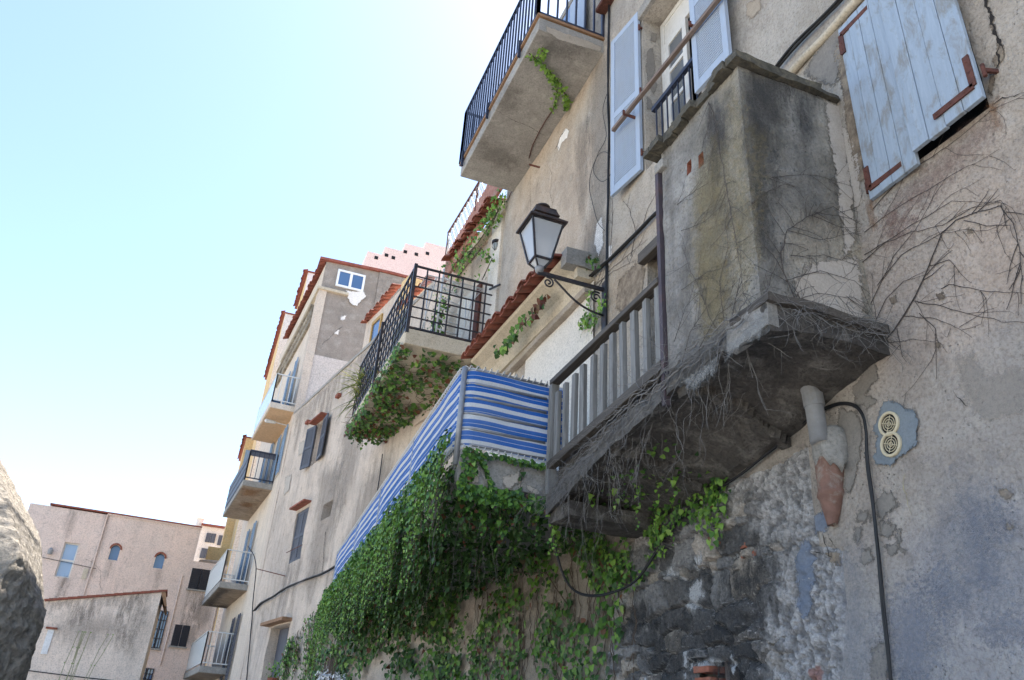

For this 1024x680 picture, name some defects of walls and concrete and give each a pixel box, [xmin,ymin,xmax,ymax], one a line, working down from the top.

crack [984,0,1003,68]
peeling [334,290,366,335]